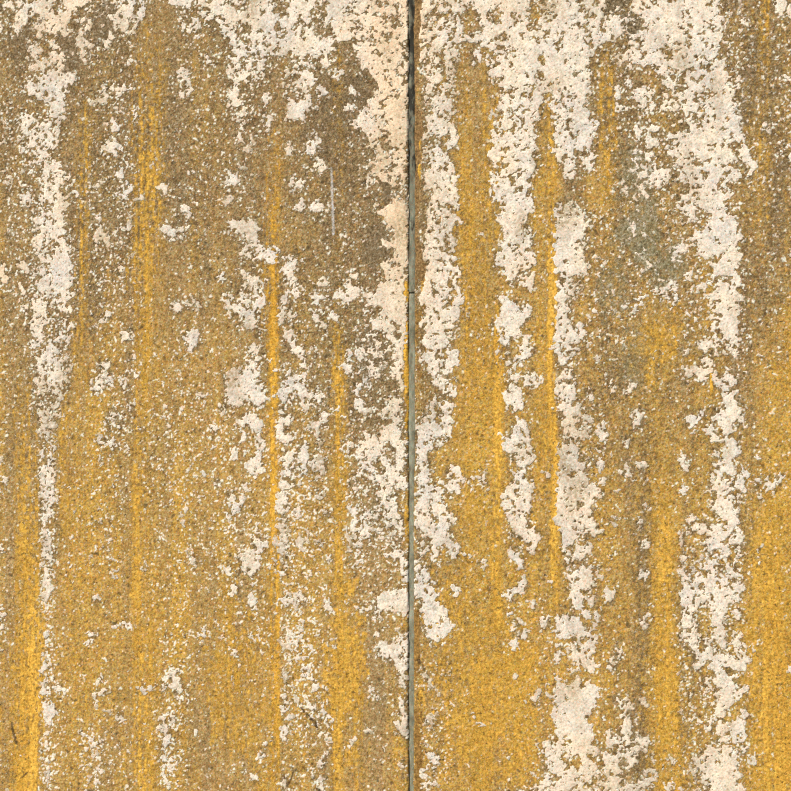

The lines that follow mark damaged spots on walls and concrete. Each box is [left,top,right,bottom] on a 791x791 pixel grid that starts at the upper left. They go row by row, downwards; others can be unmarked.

water stain [1,18,45,64]
water stain [56,0,143,76]
water stain [603,0,641,41]
water stain [300,61,373,171]
water stain [374,172,394,201]
water stain [610,150,685,288]
water stain [361,220,393,276]
water stain [356,330,387,383]
water stain [628,668,651,779]